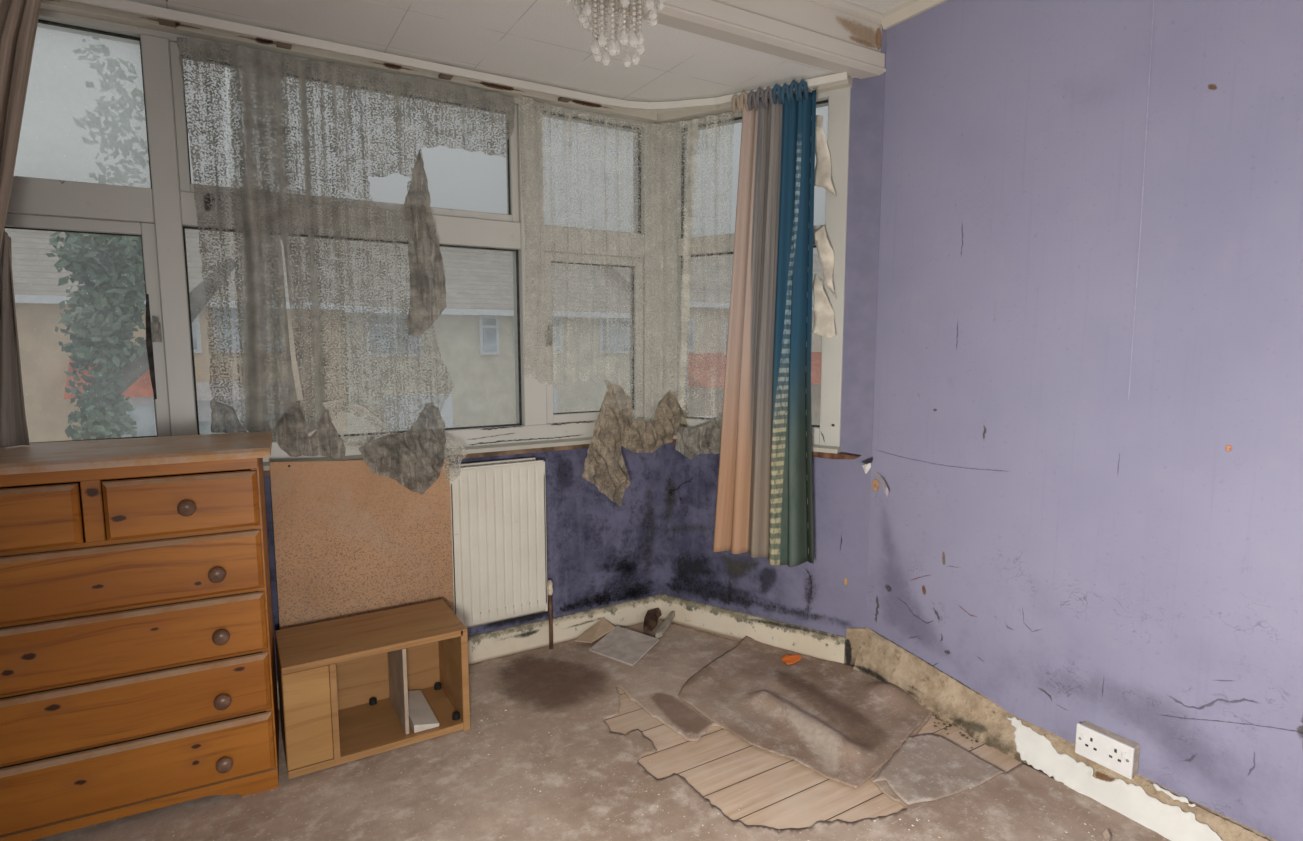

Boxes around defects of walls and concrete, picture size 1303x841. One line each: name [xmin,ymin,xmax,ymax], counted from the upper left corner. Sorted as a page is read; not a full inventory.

damp [489,547,851,664]
damp [503,659,603,707]
peeling [1006,714,1223,841]